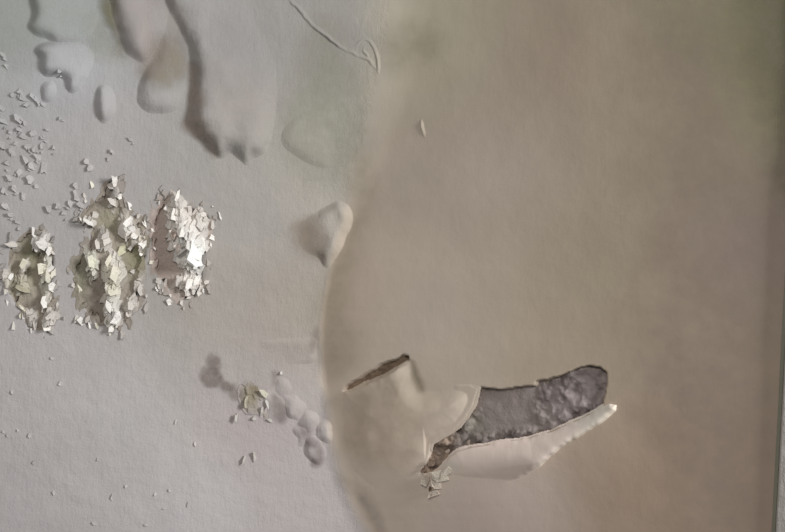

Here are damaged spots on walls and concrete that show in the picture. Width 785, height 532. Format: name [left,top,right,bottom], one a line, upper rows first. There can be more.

flaking render [0,105,222,340]
peeling [235,379,272,422]
spalling [341,356,617,498]